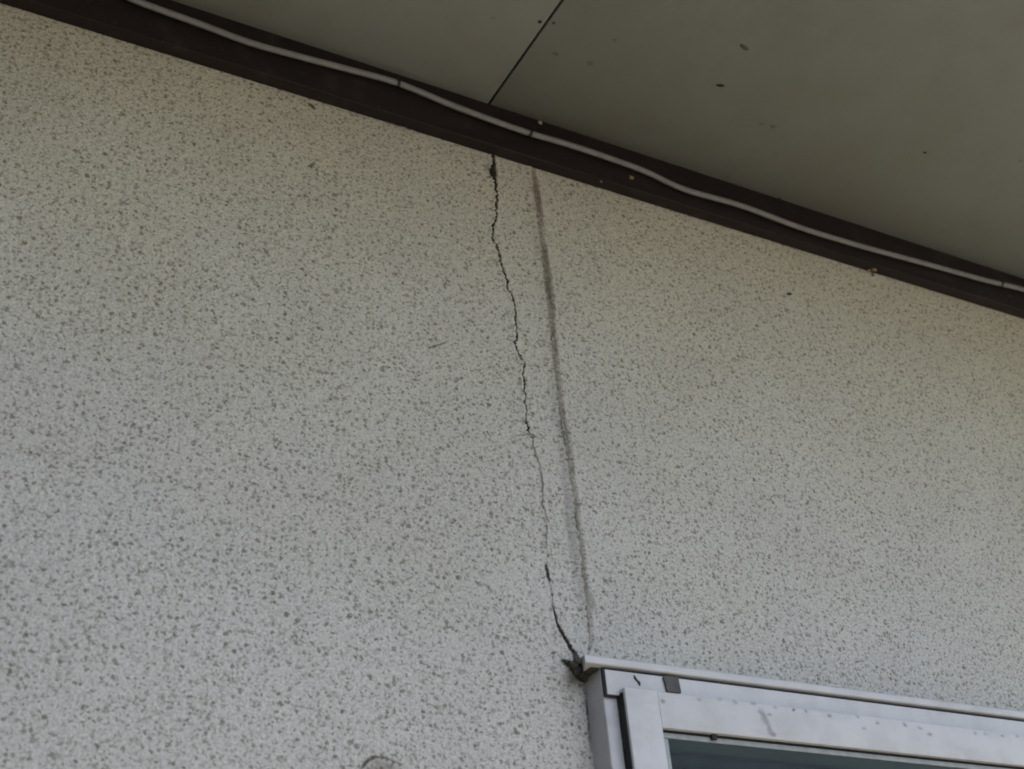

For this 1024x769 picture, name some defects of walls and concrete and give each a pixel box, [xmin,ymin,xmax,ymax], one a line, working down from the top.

crack [485,154,551,582]
crack [548,608,580,657]